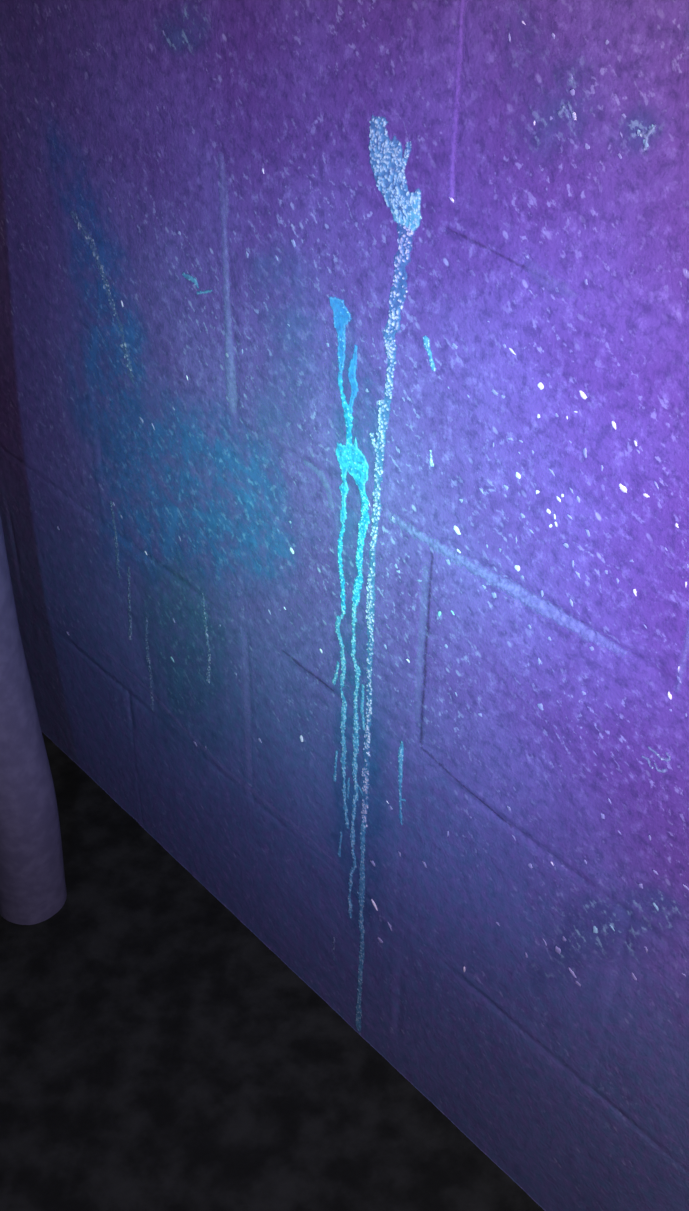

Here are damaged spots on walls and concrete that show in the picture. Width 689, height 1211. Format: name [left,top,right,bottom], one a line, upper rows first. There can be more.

leakage [329,116,422,1032]